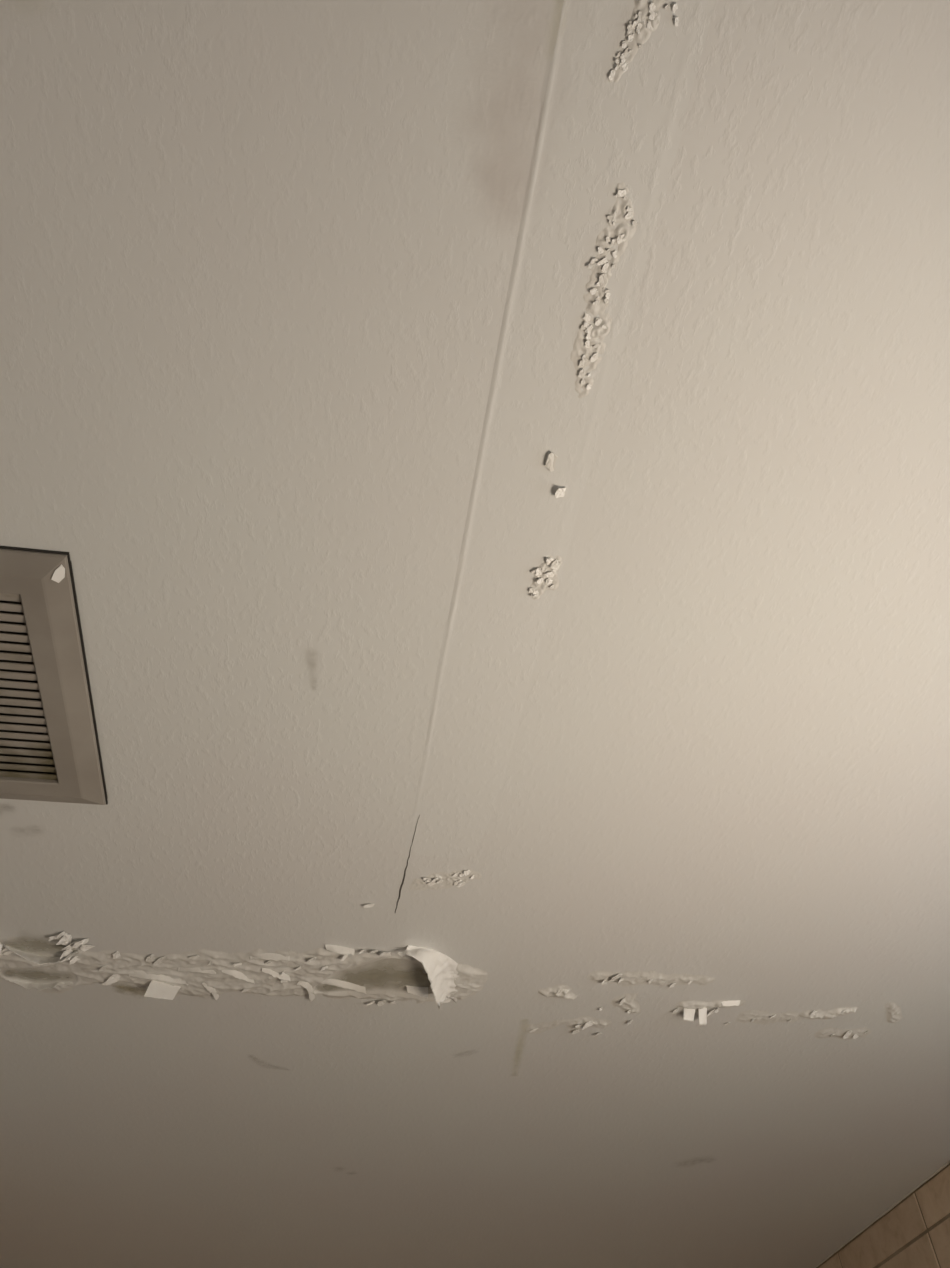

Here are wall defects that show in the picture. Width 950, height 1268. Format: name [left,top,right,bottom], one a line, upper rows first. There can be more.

crack [395,815,420,913]
peeling [0,931,489,1009]
peeling [522,970,872,1040]